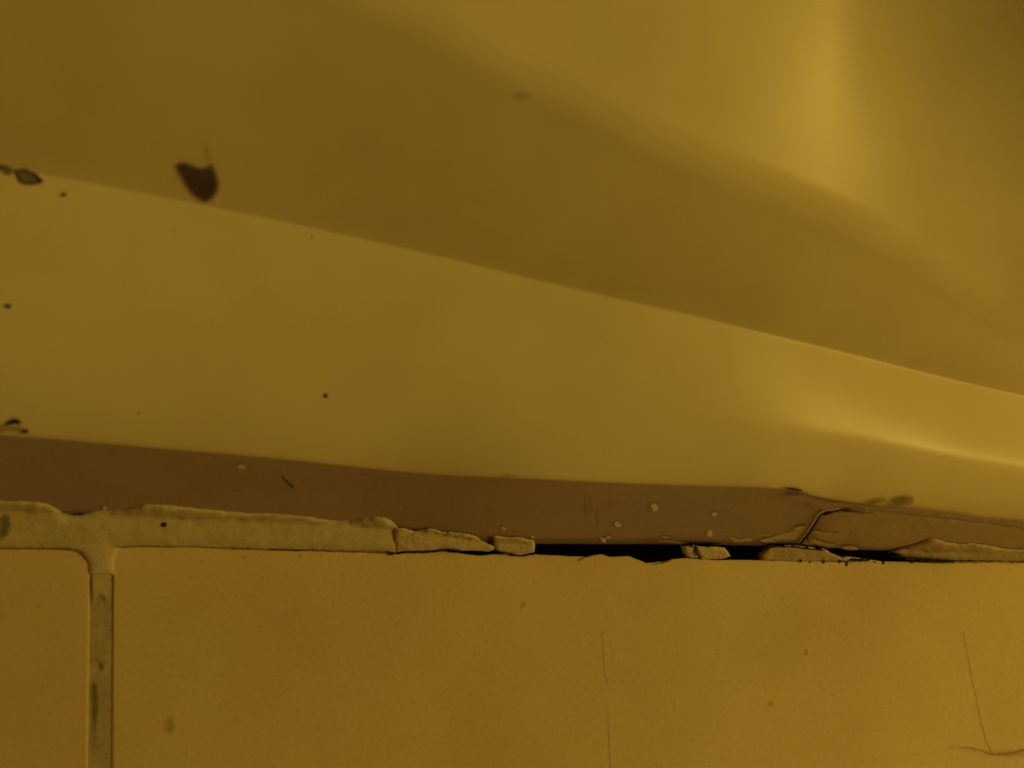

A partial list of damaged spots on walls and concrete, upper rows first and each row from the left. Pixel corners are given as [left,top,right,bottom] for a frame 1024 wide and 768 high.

peeling [728,525,859,550]
crack [764,507,1024,563]